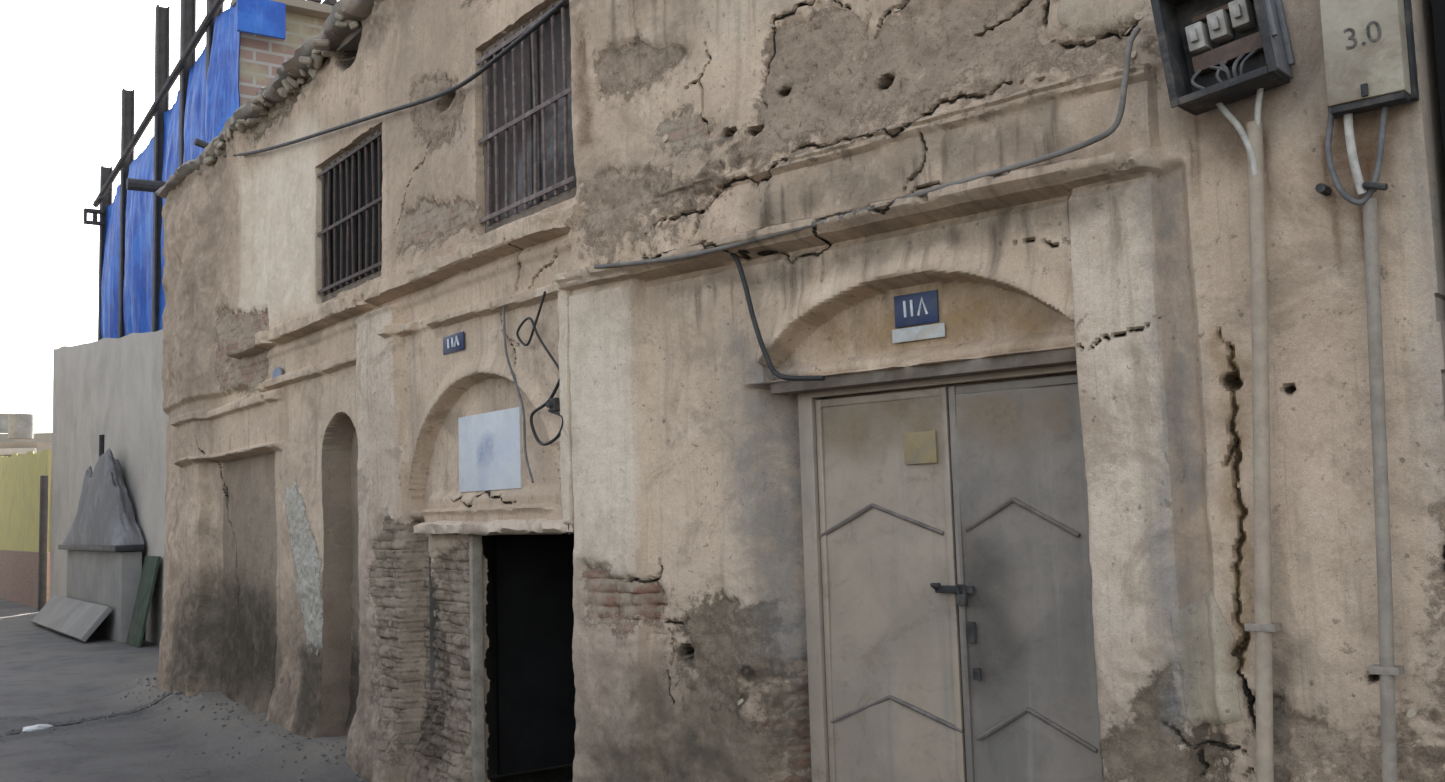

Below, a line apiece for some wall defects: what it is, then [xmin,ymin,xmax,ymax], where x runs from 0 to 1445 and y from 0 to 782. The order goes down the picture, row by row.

crack [619,80,1043,264]
crack [767,0,907,106]
spalling [570,0,1161,276]
crack [981,0,1138,49]
crack [1080,317,1161,349]
leakage [172,584,276,696]
peeling [285,481,324,656]
spalling [350,515,472,782]
spalling [582,564,812,782]
crack [1167,331,1256,776]